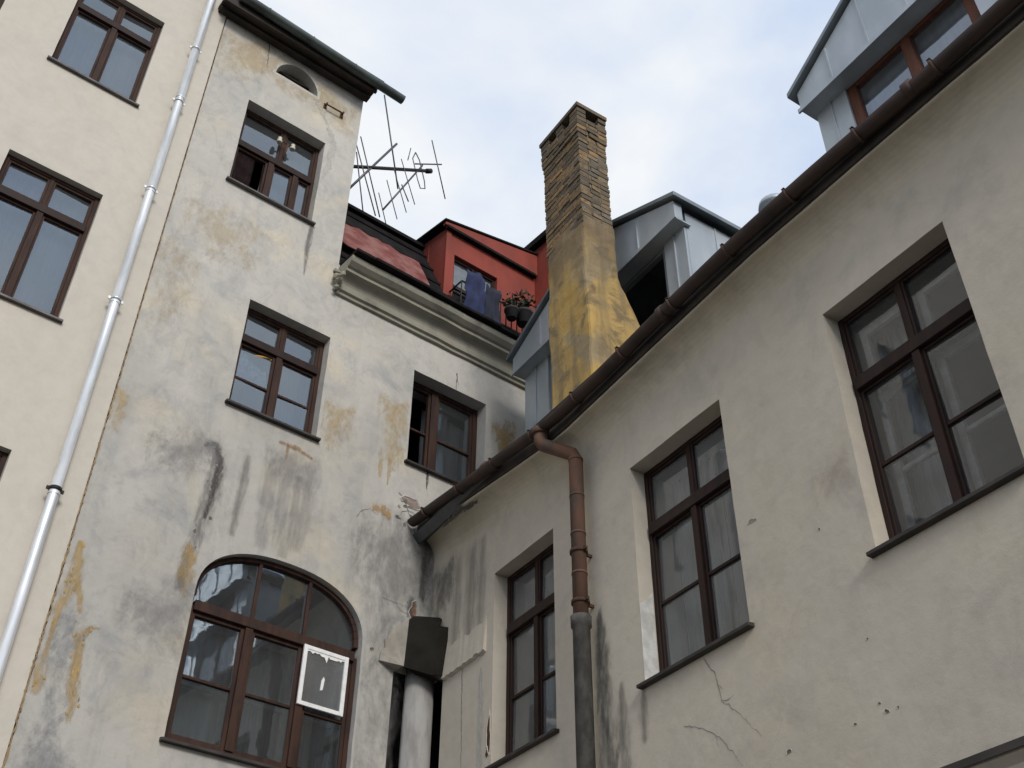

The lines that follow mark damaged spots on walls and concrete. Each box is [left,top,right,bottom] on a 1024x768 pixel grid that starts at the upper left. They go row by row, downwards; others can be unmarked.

damp [193,458,223,533]
flaking render [357,495,421,526]
peeling [43,540,86,655]
peeling [65,627,93,715]
crack [703,659,761,735]
crack [684,725,742,765]